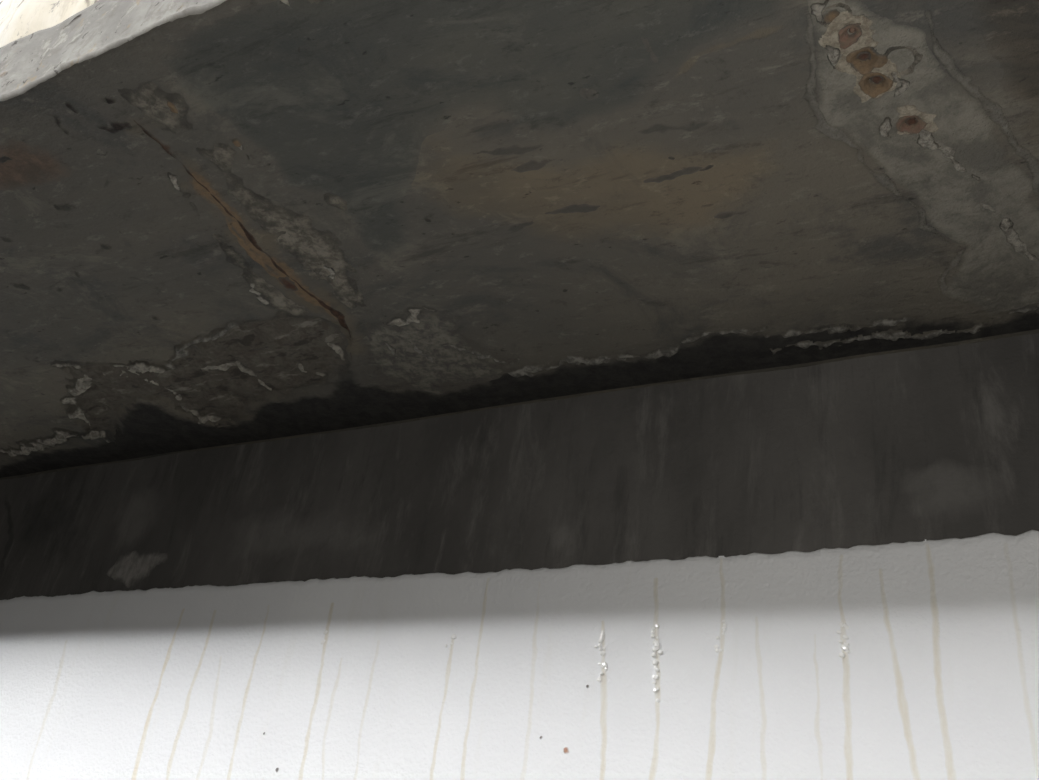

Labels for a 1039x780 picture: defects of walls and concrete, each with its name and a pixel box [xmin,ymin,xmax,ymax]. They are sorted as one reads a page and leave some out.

damp [106,476,170,588]
damp [131,608,185,780]
damp [298,602,343,780]
damp [594,620,608,780]
damp [648,577,663,780]
damp [705,556,727,780]
damp [837,554,854,780]
damp [879,568,922,780]
damp [923,539,957,780]